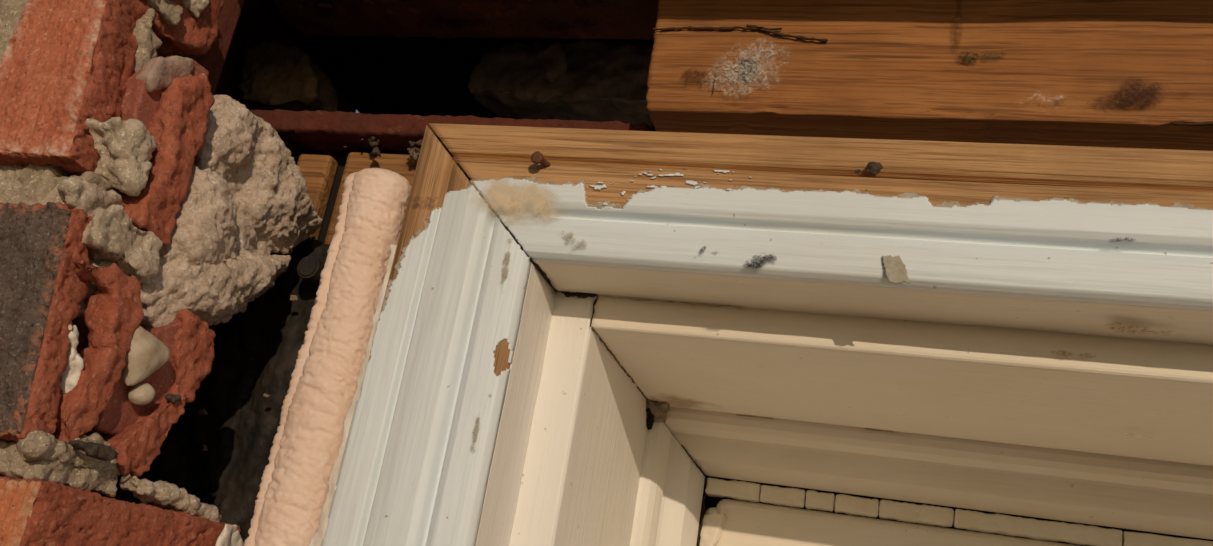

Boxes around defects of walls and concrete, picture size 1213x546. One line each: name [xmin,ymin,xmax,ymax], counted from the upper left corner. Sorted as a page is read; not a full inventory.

crack [653,24,828,42]
spalling [0,0,323,522]
peeling [308,168,1213,546]